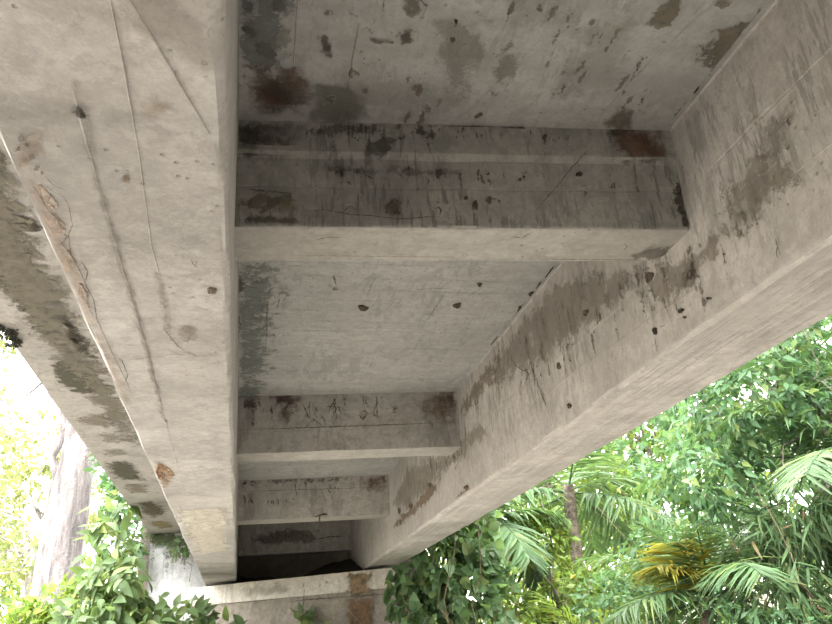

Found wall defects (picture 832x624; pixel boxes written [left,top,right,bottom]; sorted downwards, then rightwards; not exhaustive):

damp [239,0,299,75]
rust [254,69,312,113]
peeling [14,135,66,240]
rust [611,129,665,164]
damp [719,100,802,238]
crack [29,166,216,399]
damp [631,247,669,259]
damp [685,244,706,306]
damp [239,261,291,410]
spalling [156,462,174,485]
rust [346,572,374,624]